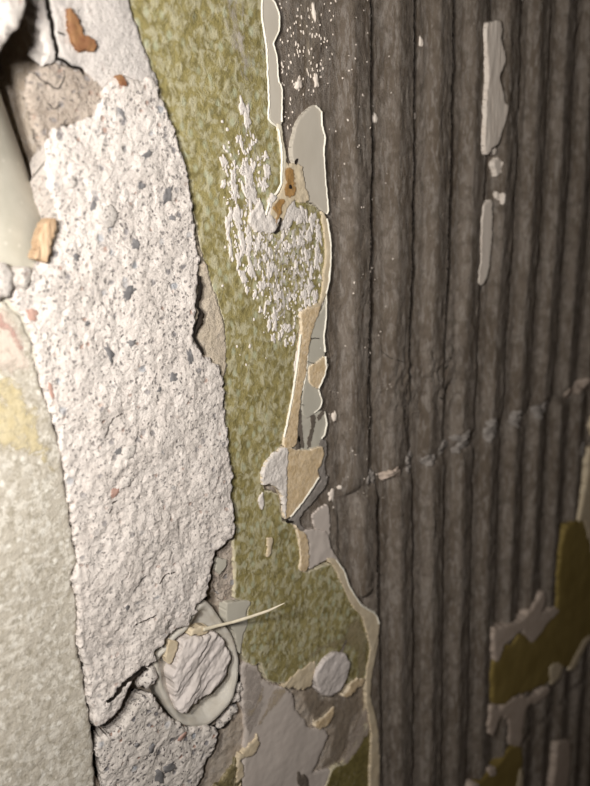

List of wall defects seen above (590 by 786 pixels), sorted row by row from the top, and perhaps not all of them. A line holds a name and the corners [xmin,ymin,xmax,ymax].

peeling [481,20,509,177]
leakage [219,95,324,372]
rust [272,168,296,224]
peeling [478,191,506,285]
peeling [210,0,380,786]
peeling [486,686,550,747]
peeling [546,739,571,786]